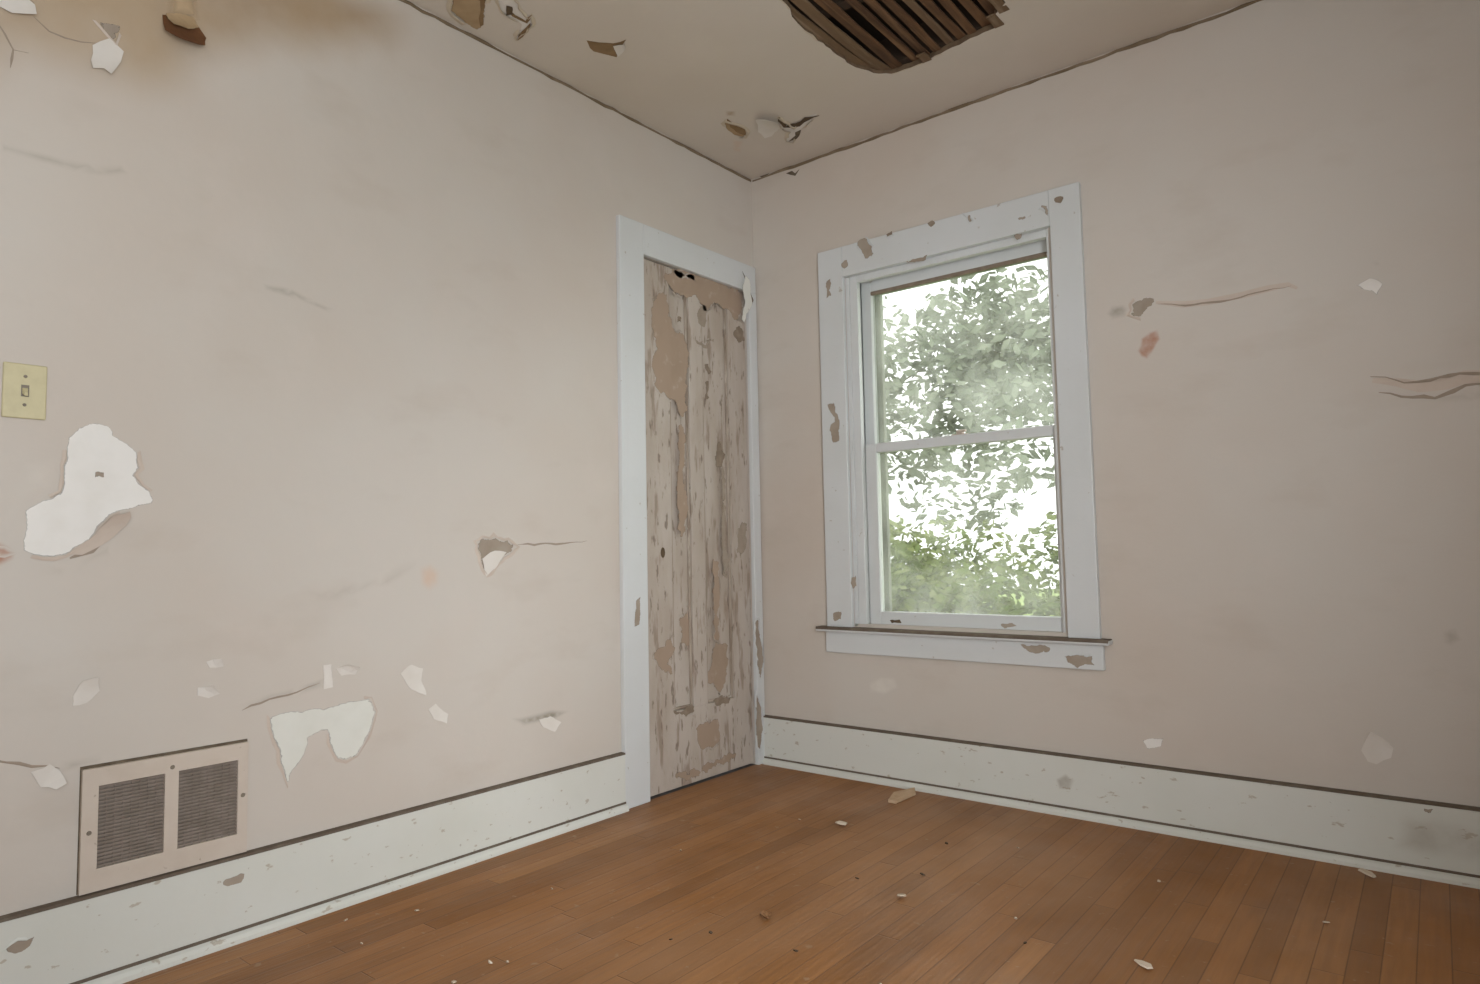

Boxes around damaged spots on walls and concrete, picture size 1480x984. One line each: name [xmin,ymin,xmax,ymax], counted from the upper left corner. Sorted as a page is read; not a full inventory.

peeling [0,0,37,14]
peeling [91,20,124,73]
peeling [446,0,536,41]
peeling [587,40,626,57]
spalling [780,0,1010,75]
peeling [720,110,819,154]
crack [1156,282,1298,308]
peeling [24,423,153,561]
peeling [473,532,520,577]
peeling [267,696,378,789]